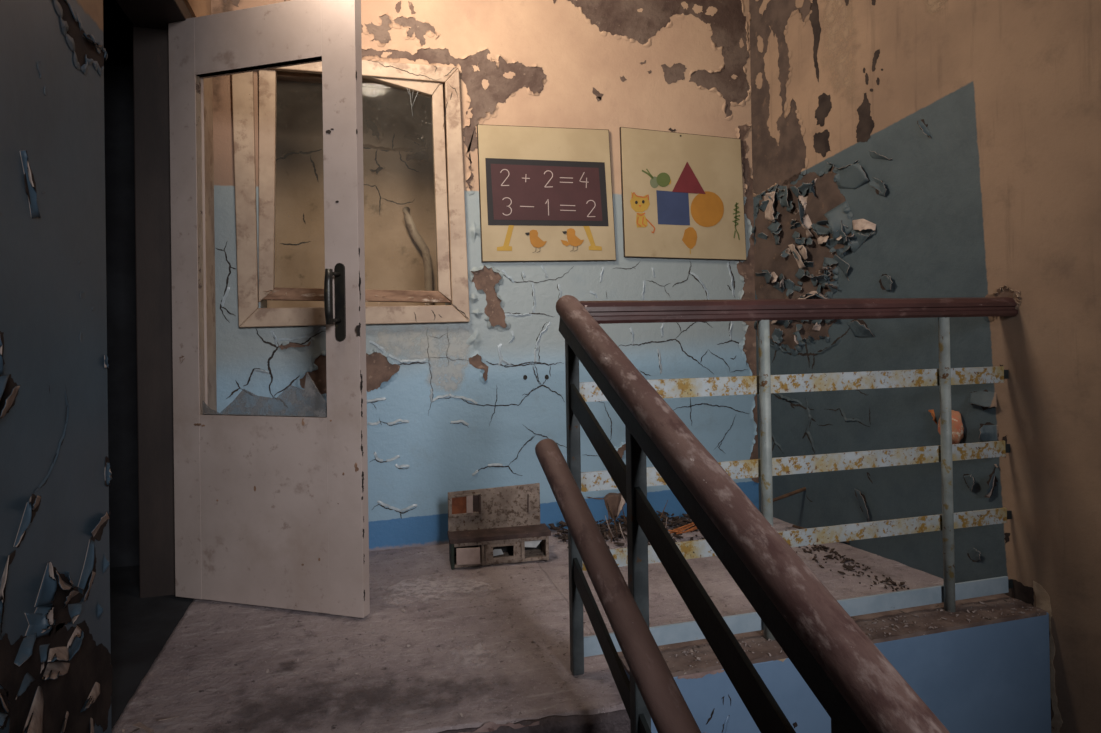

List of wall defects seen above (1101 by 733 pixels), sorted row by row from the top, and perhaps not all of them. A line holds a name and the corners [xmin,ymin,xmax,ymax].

peeling [362,1,547,195]
peeling [553,0,882,300]
peeling [856,49,892,160]
crack [216,242,236,323]
crack [226,325,326,408]
peeling [360,348,400,417]
peeling [468,263,511,331]
crack [367,265,612,476]
crack [674,397,749,451]
crack [589,262,850,376]
crack [772,389,871,454]
peeling [0,494,113,733]